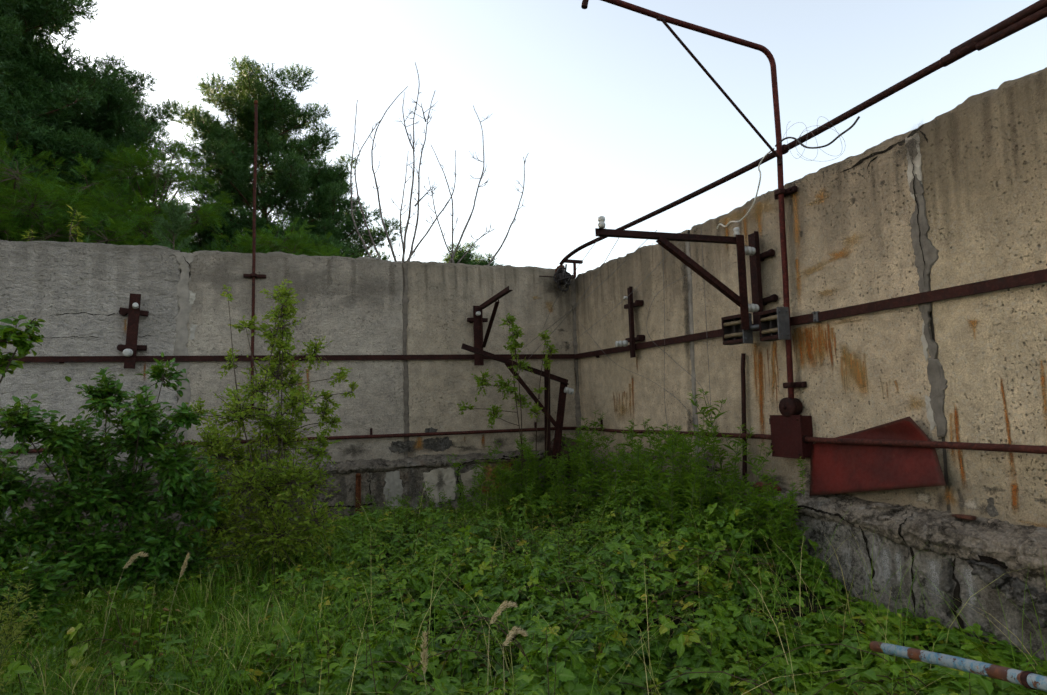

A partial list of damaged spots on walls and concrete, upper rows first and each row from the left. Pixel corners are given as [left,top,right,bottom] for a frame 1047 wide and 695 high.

crack [842,125,928,172]
corrosion [792,320,867,388]
corrosion [753,341,779,443]
corrosion [950,408,965,481]
corrosion [1001,381,1014,471]
crack [898,518,915,612]
crack [939,558,964,629]